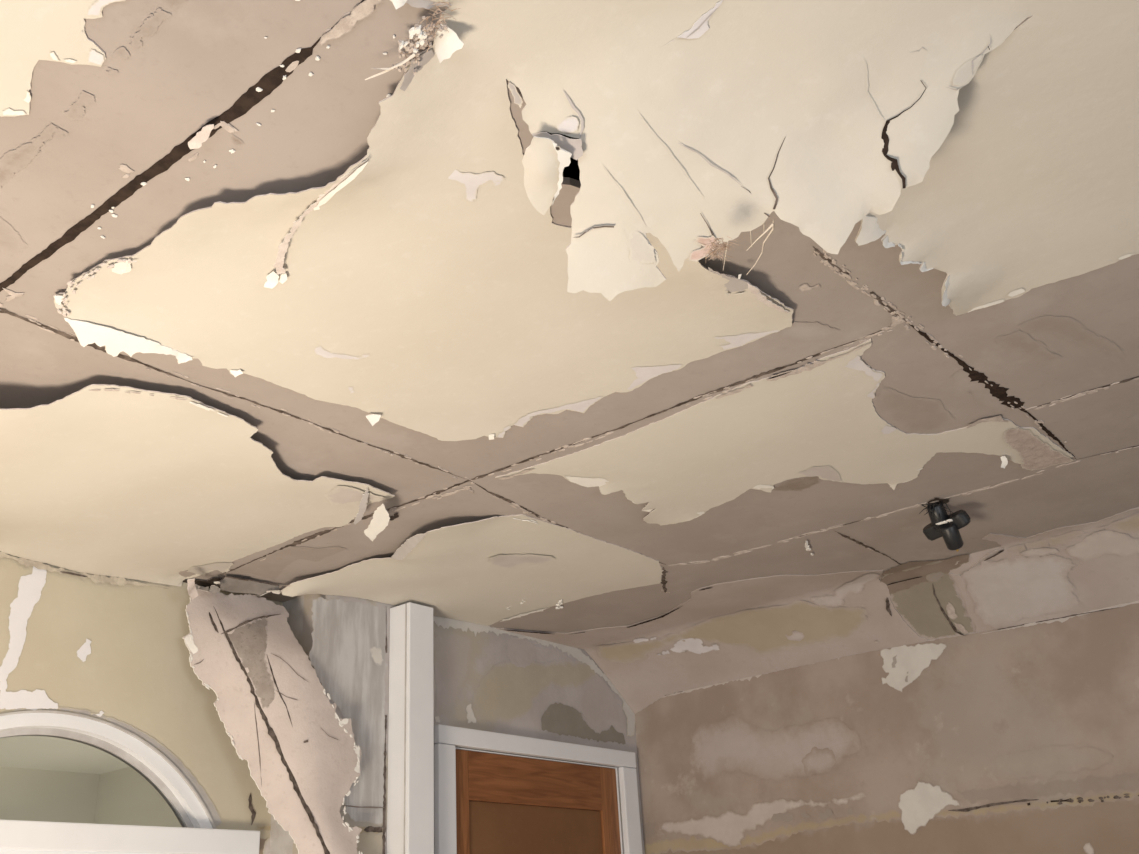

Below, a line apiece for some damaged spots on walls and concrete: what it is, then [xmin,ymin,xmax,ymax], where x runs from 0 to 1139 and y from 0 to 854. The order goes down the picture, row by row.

crack [0,0,1139,628]
peeling [366,414,381,426]
peeling [364,503,390,541]
crack [982,601,1139,634]